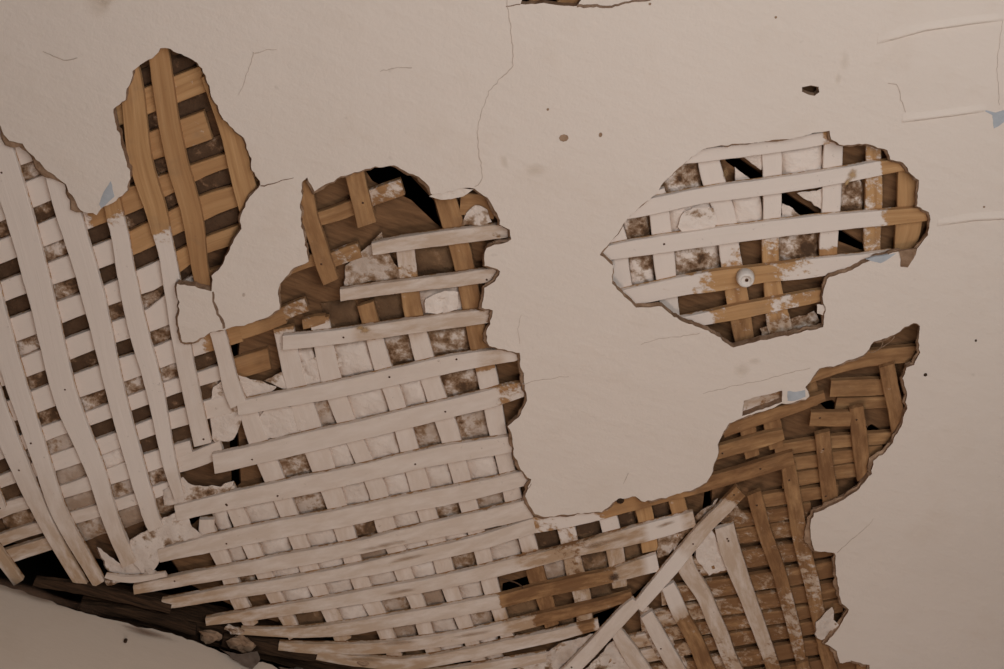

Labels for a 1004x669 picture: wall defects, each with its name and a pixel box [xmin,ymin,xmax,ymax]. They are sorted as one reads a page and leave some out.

crack [577,0,650,8]
flaking render [0,126,86,213]
flaking render [191,59,260,289]
crack [474,4,520,187]
flaking render [825,131,930,267]
peeling [986,110,1004,128]
flaking render [174,282,223,344]
flaking render [300,165,668,519]
flaking render [782,268,852,334]
flaking render [780,323,920,473]
flaking render [803,482,869,669]
peeling [222,650,260,669]